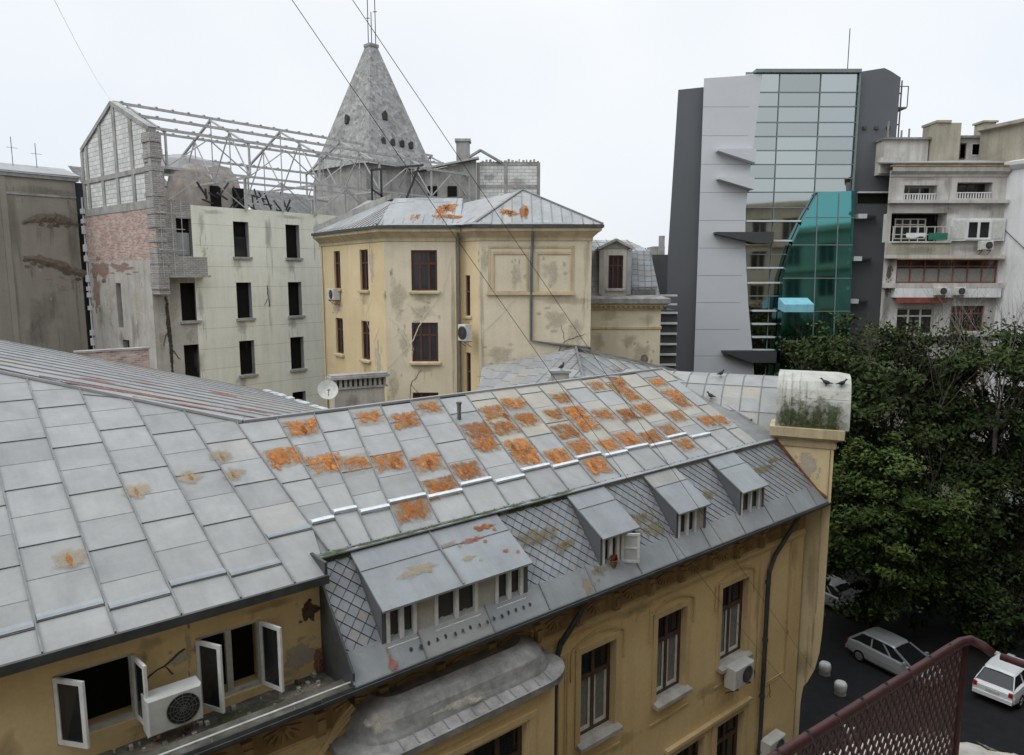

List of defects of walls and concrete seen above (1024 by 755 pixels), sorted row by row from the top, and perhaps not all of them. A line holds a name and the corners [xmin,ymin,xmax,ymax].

corrosion [434,204,463,219]
corrosion [500,205,529,218]
spalling [89,257,138,312]
crack [163,296,180,373]
corrosion [461,367,695,474]
corrosion [68,377,480,523]
corrosion [57,550,84,566]
corrosion [441,524,496,561]
peeling [299,599,321,623]
crack [147,648,185,679]